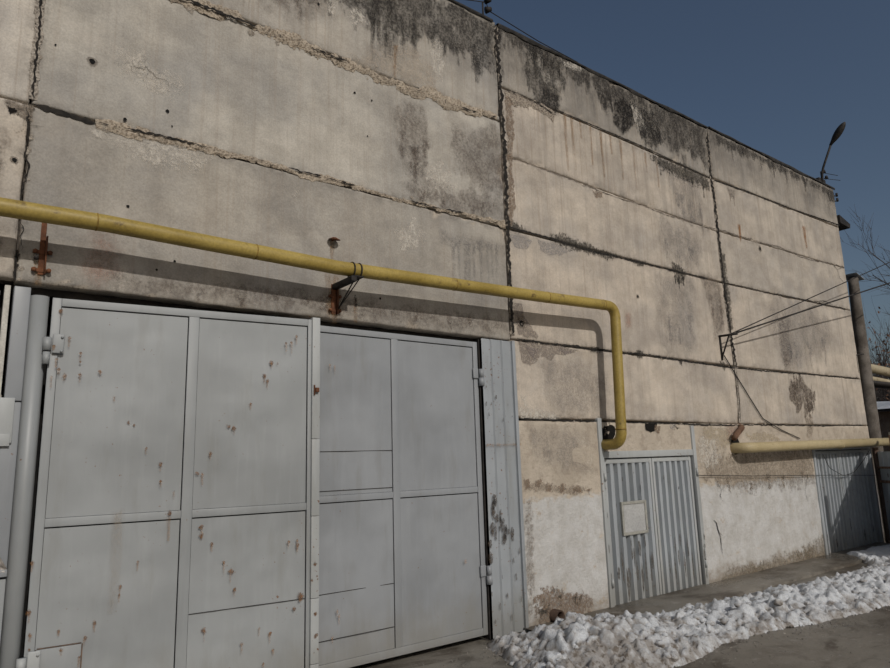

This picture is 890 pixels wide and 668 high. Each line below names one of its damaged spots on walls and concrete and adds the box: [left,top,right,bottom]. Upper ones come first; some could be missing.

spalling [4,0,46,121]
crack [20,107,44,201]
spalling [95,0,555,287]
crack [13,222,25,281]
peeling [509,298,577,364]
damp [789,375,816,419]